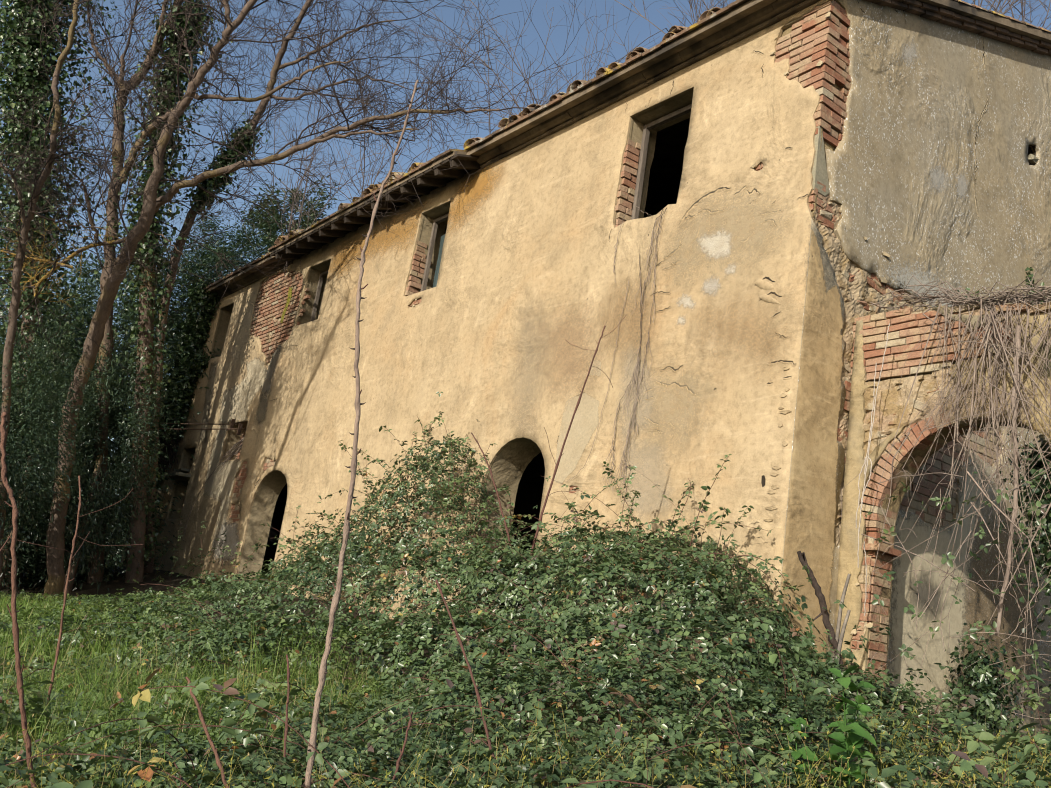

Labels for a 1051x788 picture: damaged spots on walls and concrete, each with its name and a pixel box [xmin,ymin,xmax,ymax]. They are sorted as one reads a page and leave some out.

spalling [770,0,851,148]
crack [973,36,989,217]
crack [649,185,808,314]
spalling [850,300,1013,382]
spalling [203,270,311,561]
damp [913,577,940,613]